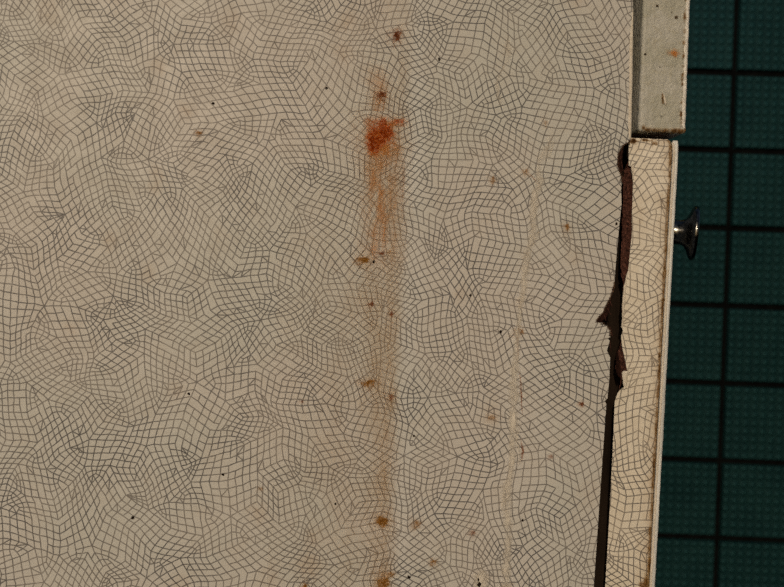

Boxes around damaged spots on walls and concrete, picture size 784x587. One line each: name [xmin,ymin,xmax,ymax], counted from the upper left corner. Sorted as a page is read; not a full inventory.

corrosion [366,119,403,155]
peeling [596,282,615,349]